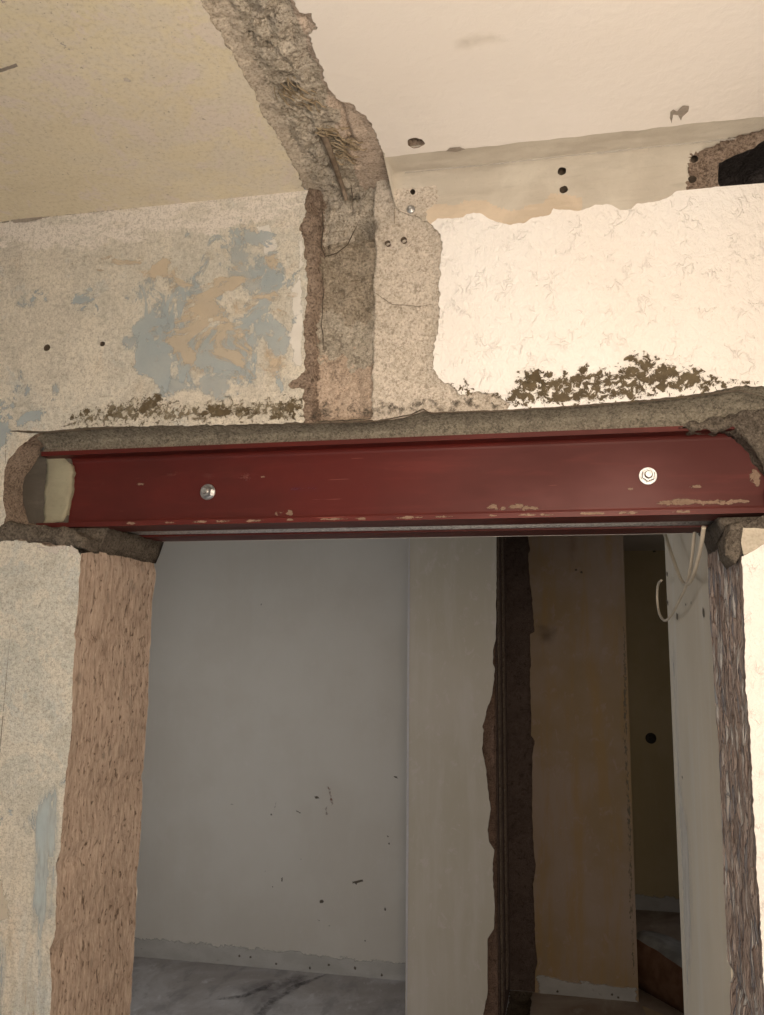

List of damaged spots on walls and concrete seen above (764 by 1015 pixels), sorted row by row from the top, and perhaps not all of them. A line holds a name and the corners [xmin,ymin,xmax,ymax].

peeling [0,384,46,449]
flaking render [107,0,510,425]